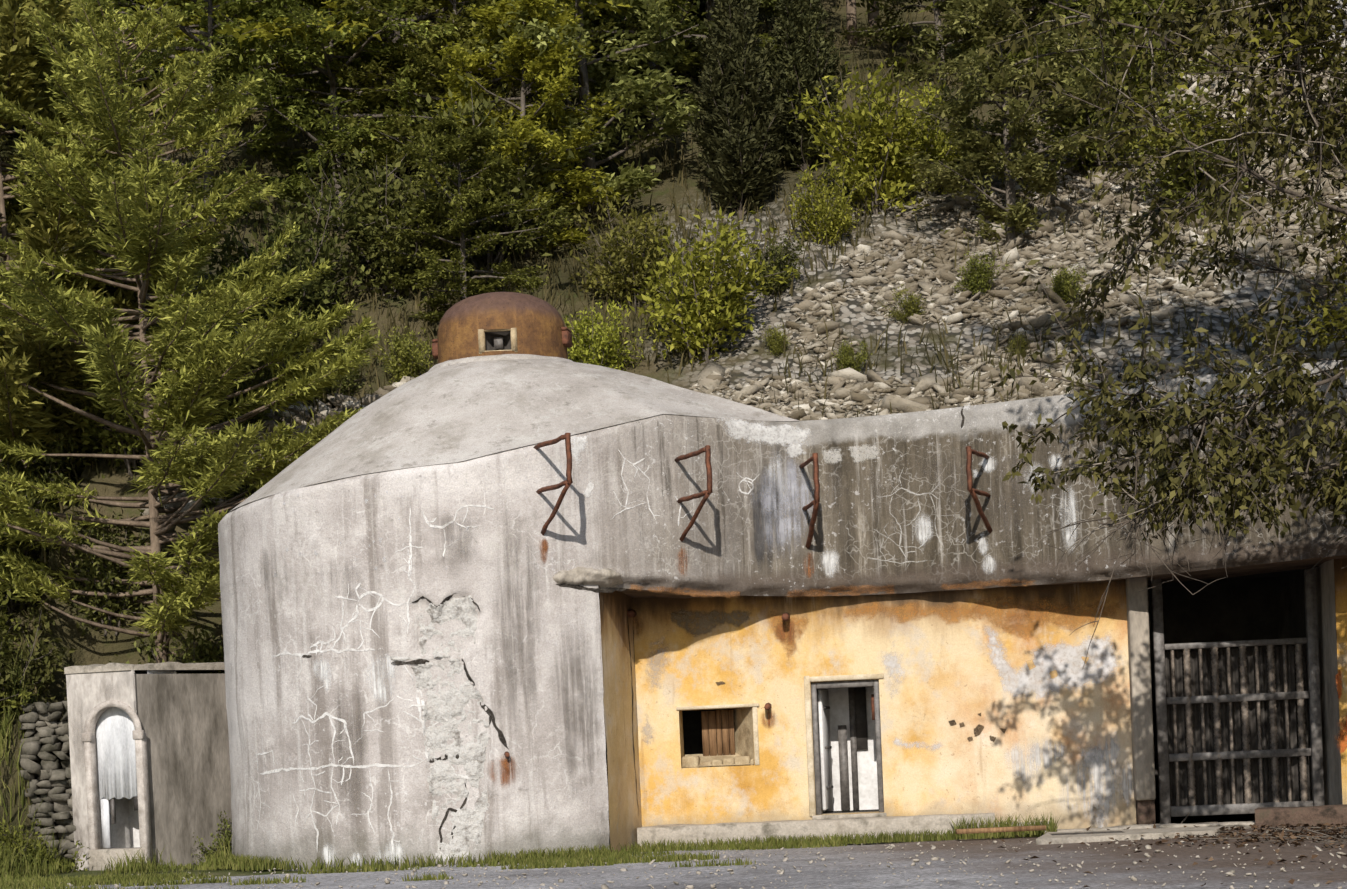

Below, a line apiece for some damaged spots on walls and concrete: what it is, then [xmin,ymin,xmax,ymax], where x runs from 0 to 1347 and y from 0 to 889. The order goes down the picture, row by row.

water stain [571,436,587,460]
water stain [671,610,749,635]
water stain [772,615,807,653]
water stain [845,599,1118,636]
crack [250,505,494,853]
water stain [372,656,393,698]
peeling [988,631,1117,697]
crack [462,659,508,749]
spalling [390,593,490,861]
corrosion [493,751,513,783]